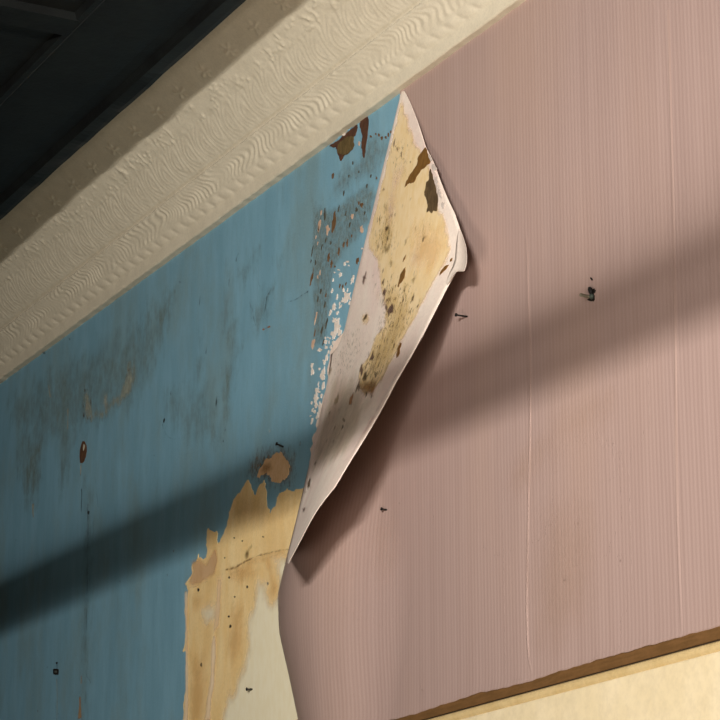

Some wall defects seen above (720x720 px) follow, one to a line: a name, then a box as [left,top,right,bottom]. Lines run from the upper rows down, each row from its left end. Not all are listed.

peeling [310,261,354,424]
peeling [330,117,369,161]
damp [310,105,450,404]
peeling [183,452,303,720]